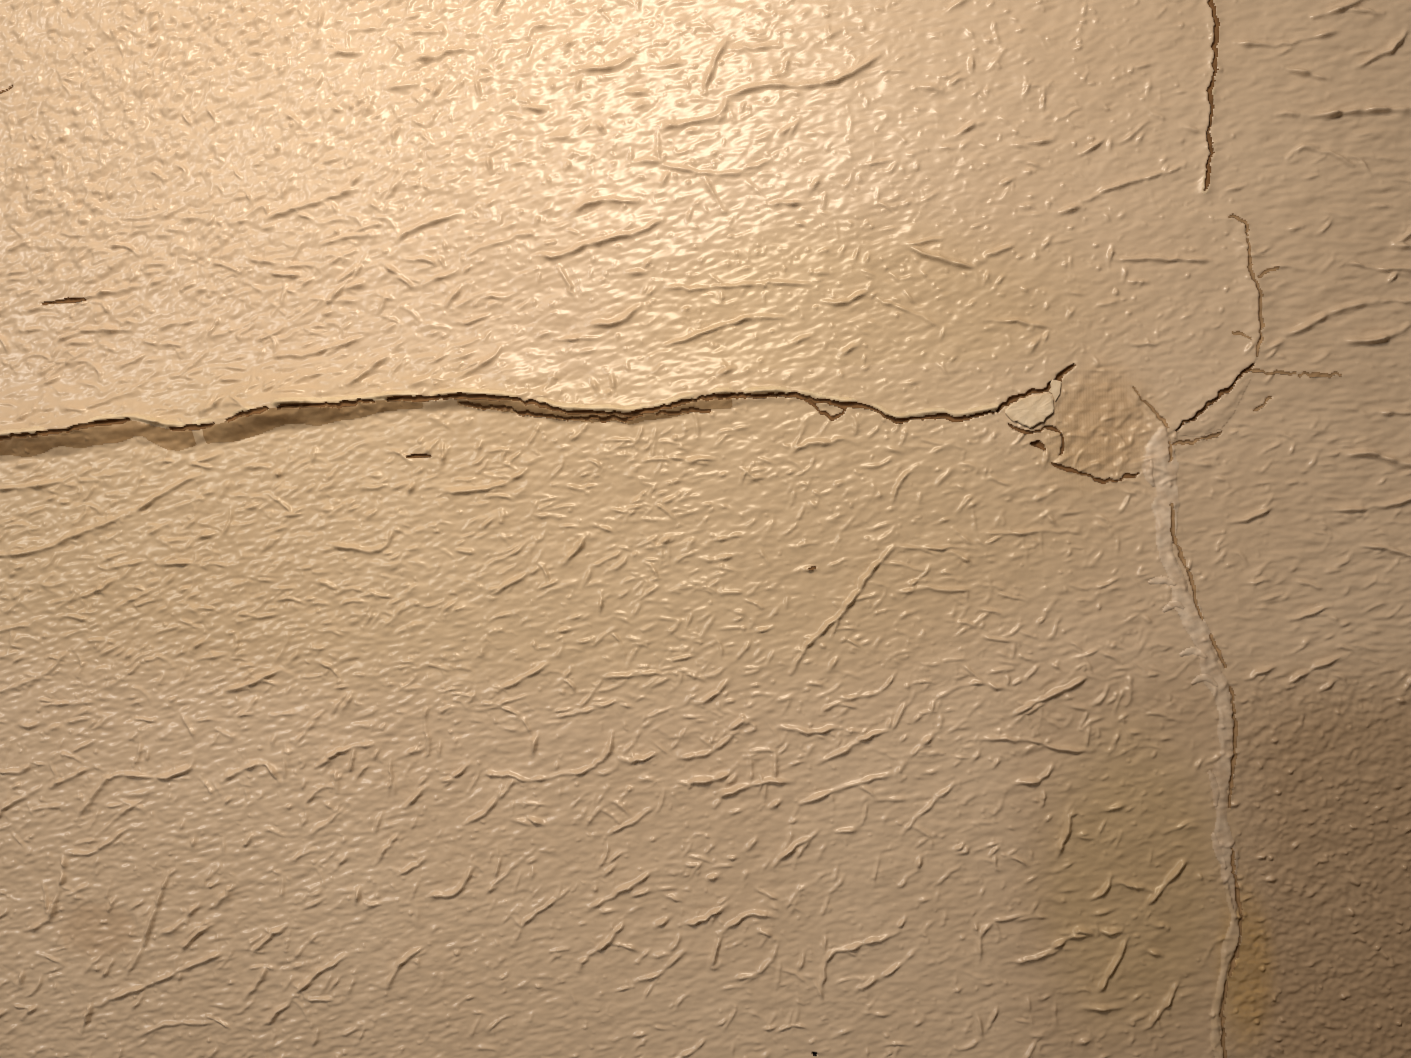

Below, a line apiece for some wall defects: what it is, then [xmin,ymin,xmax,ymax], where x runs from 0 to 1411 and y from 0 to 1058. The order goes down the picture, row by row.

crack [1132,0,1342,445]
crack [0,363,1140,484]
peeling [1005,379,1061,428]